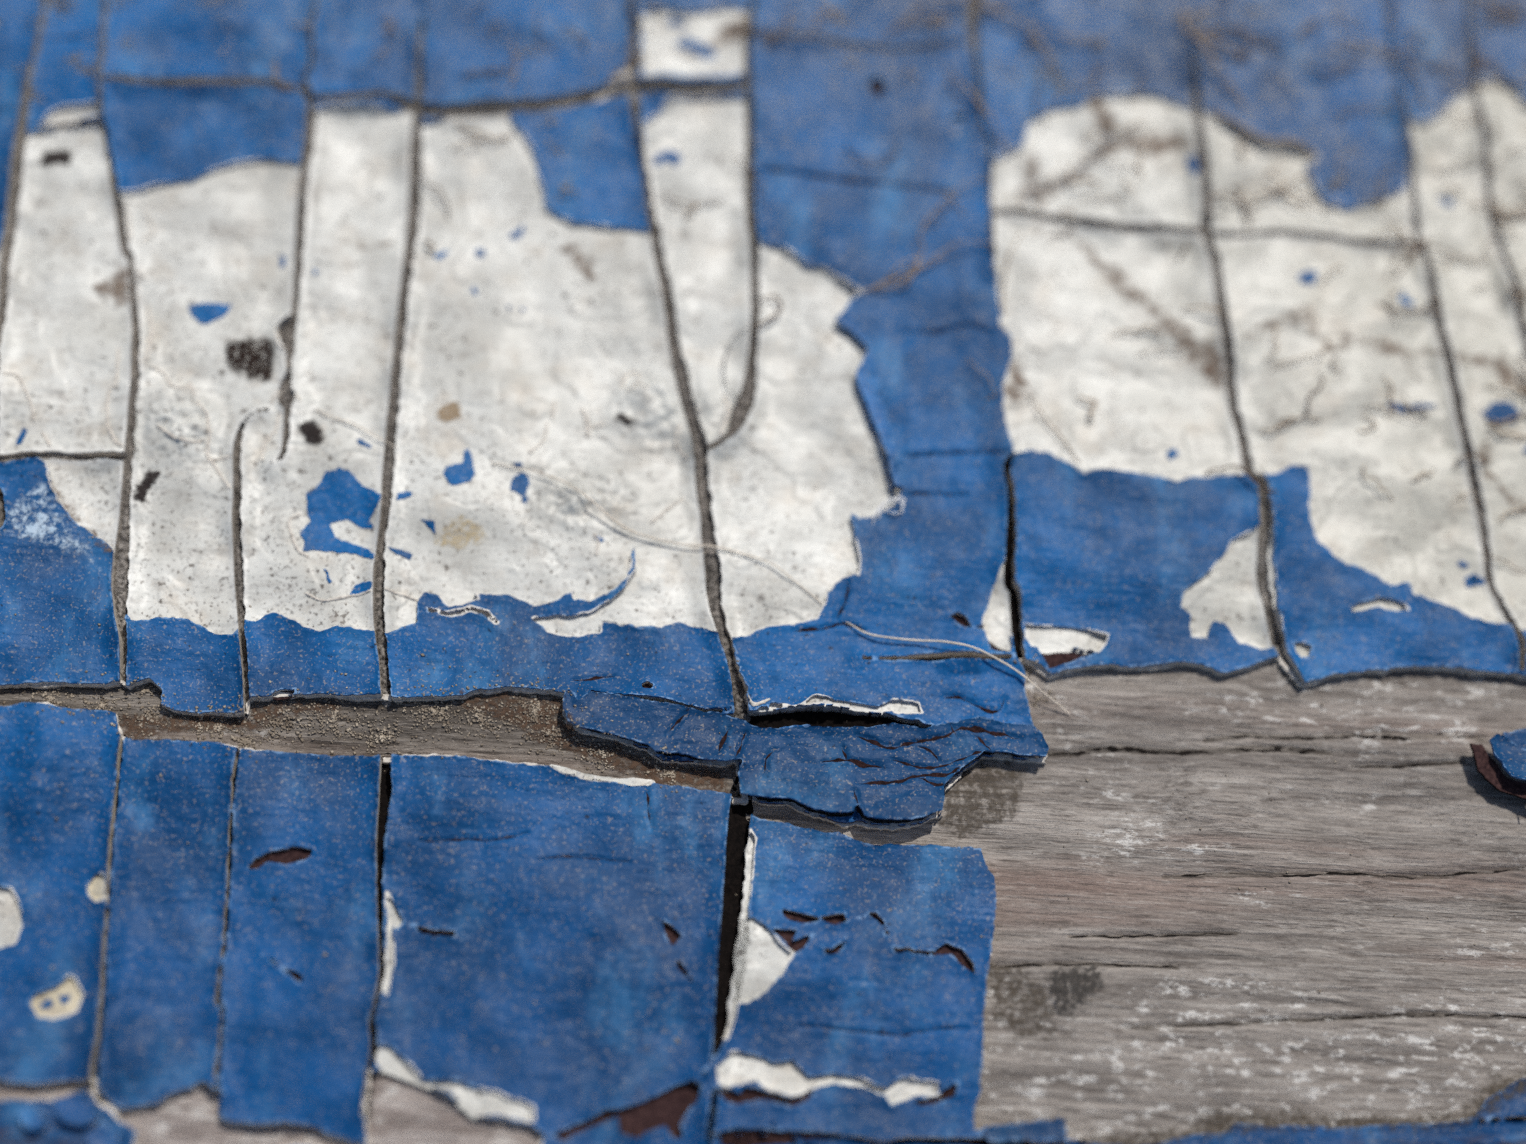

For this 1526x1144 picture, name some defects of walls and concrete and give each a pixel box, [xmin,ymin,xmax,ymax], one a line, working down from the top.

crack [0,0,141,691]
crack [90,734,131,1101]
crack [216,426,253,1097]
crack [279,6,317,460]
peeling [0,98,904,643]
peeling [642,8,749,86]
peeling [0,517,1526,1144]
peeling [869,80,885,97]
crack [363,0,1526,1144]
peeling [990,81,1526,634]